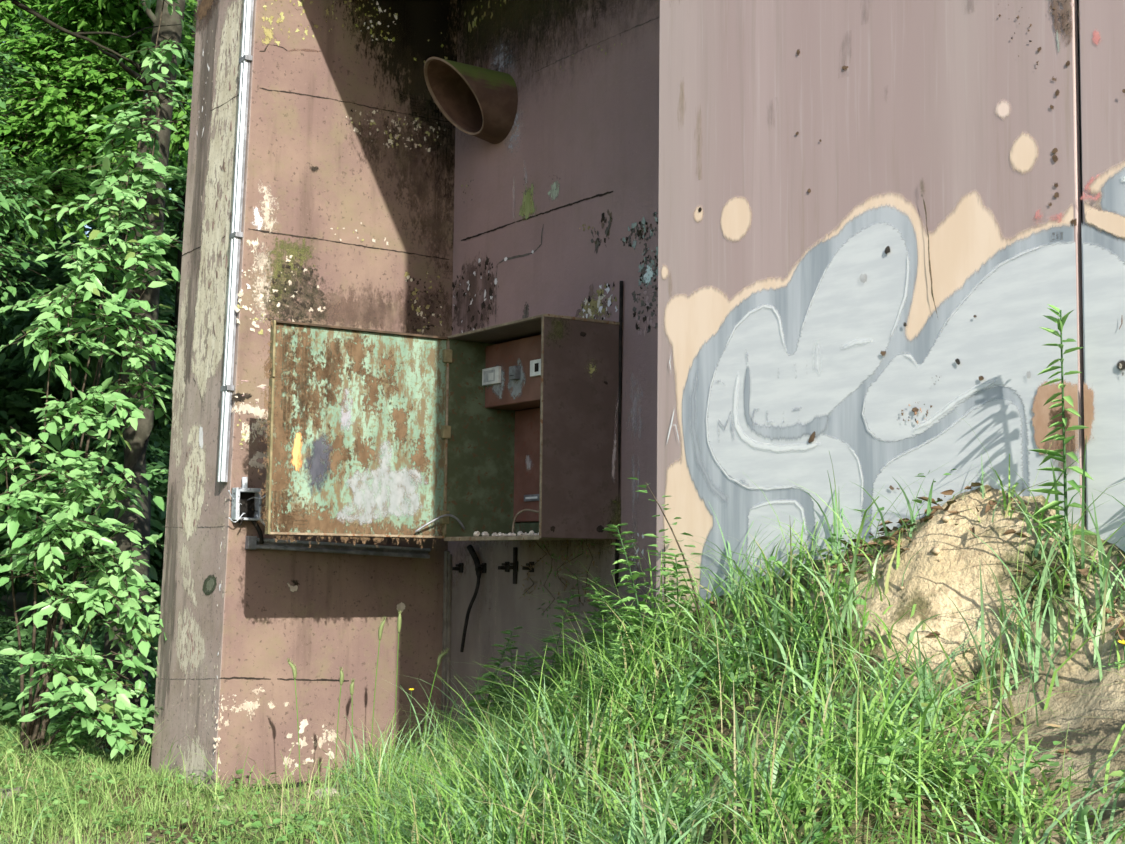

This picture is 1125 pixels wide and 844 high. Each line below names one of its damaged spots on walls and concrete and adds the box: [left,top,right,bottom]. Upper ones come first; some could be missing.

peeling [262,0,362,46]
rust [1049,0,1079,51]
water stain [313,0,615,336]
peeling [579,213,611,254]
peeling [451,257,496,334]
peeling [576,282,618,320]
peeling [622,212,658,337]
peeling [172,0,289,785]
rust [258,318,443,549]
peeling [283,719,338,775]